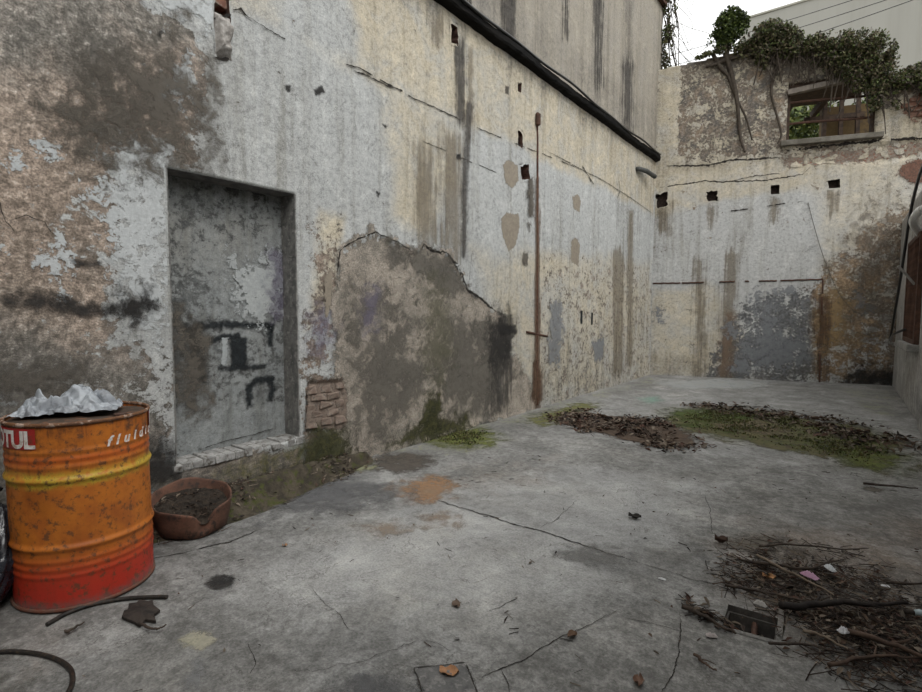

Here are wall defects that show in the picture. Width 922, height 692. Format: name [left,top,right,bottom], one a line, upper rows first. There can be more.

peeling [144,0,234,119]
water stain [418,40,473,260]
crack [346,64,649,211]
water stain [501,0,516,39]
water stain [593,0,604,93]
water stain [622,57,635,129]
crack [660,157,806,188]
flaking render [780,136,922,184]
peeling [78,124,180,351]
flaking render [305,223,535,457]
corrosion [522,177,543,409]
crack [438,500,722,585]